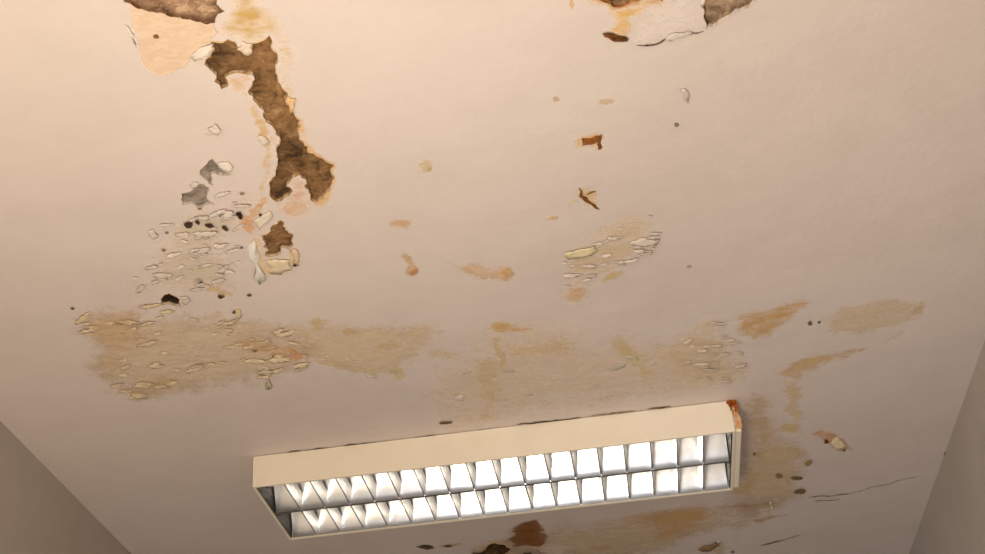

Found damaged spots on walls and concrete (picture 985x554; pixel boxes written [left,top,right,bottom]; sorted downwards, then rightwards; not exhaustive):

flaking render [592,0,756,47]
peeling [70,0,335,400]
peeling [562,215,662,301]
damp [741,303,804,338]
damp [734,350,857,525]
flaking render [471,520,547,554]